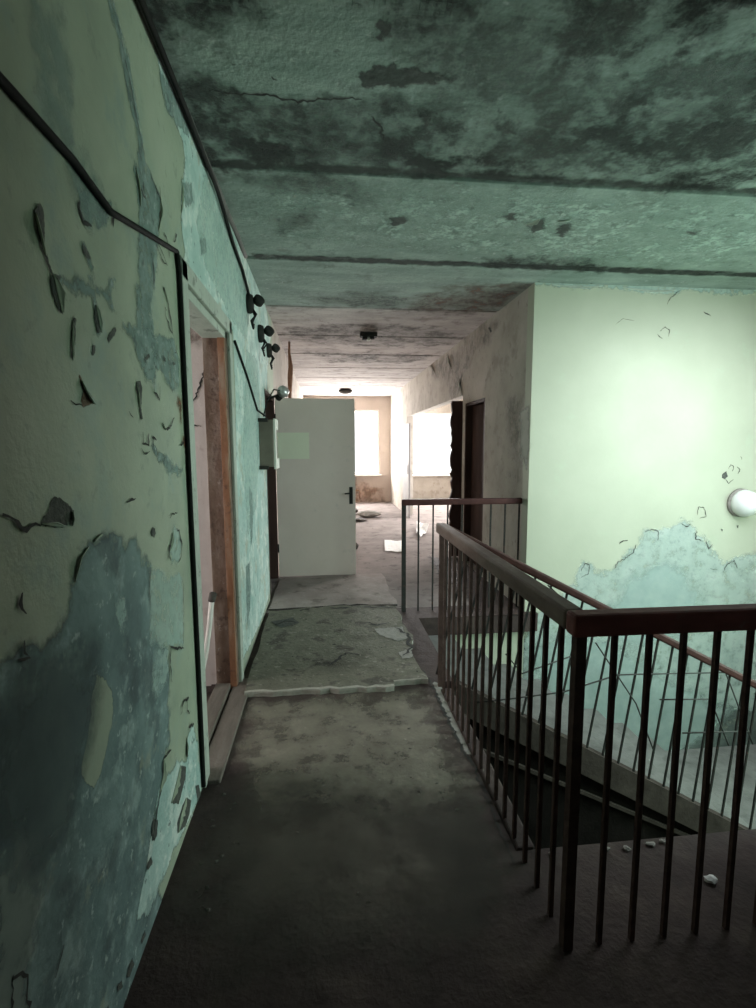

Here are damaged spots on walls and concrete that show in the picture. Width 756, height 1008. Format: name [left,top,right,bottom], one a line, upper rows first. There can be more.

leakage [145,0,258,40]
leakage [179,0,756,194]
peeling [35,0,179,420]
spalling [2,497,75,533]
peeling [563,521,756,610]
peeling [523,612,572,695]
peeling [584,630,756,751]
peeling [0,528,201,1008]